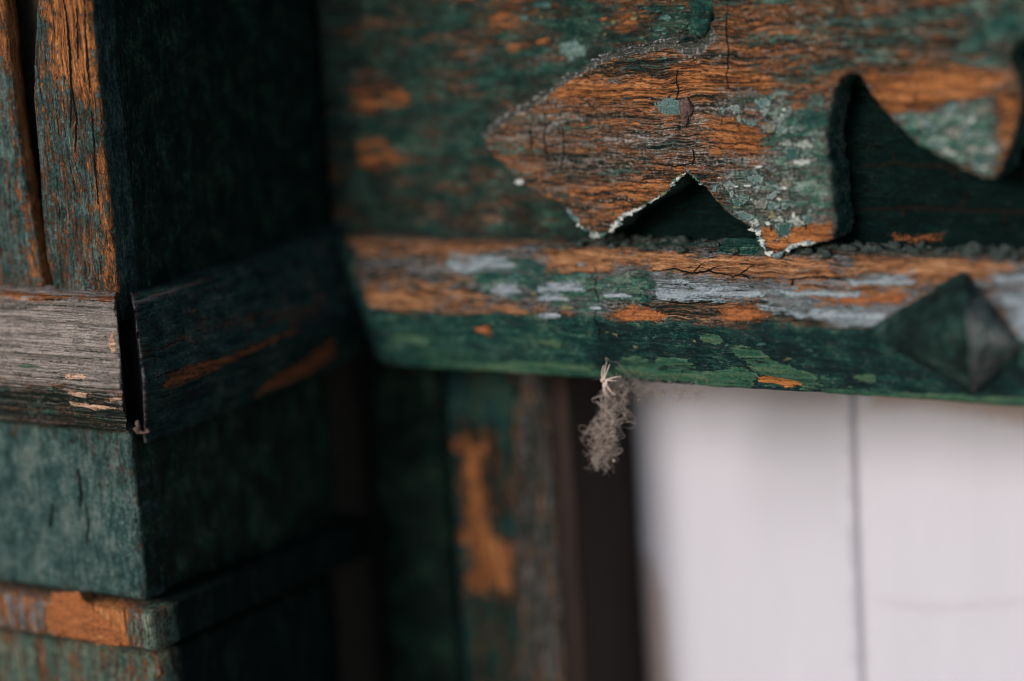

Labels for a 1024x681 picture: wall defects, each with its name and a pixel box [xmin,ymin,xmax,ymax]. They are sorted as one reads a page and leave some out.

peeling [507,38,549,53]
peeling [638,5,685,39]
crack [63,0,99,205]
peeling [898,97,999,170]
peeling [566,93,817,259]
peeling [892,232,943,244]
peeling [445,251,667,323]
crack [652,262,754,304]
peeling [712,274,916,327]
peeling [993,274,1024,342]
peeling [48,591,126,647]